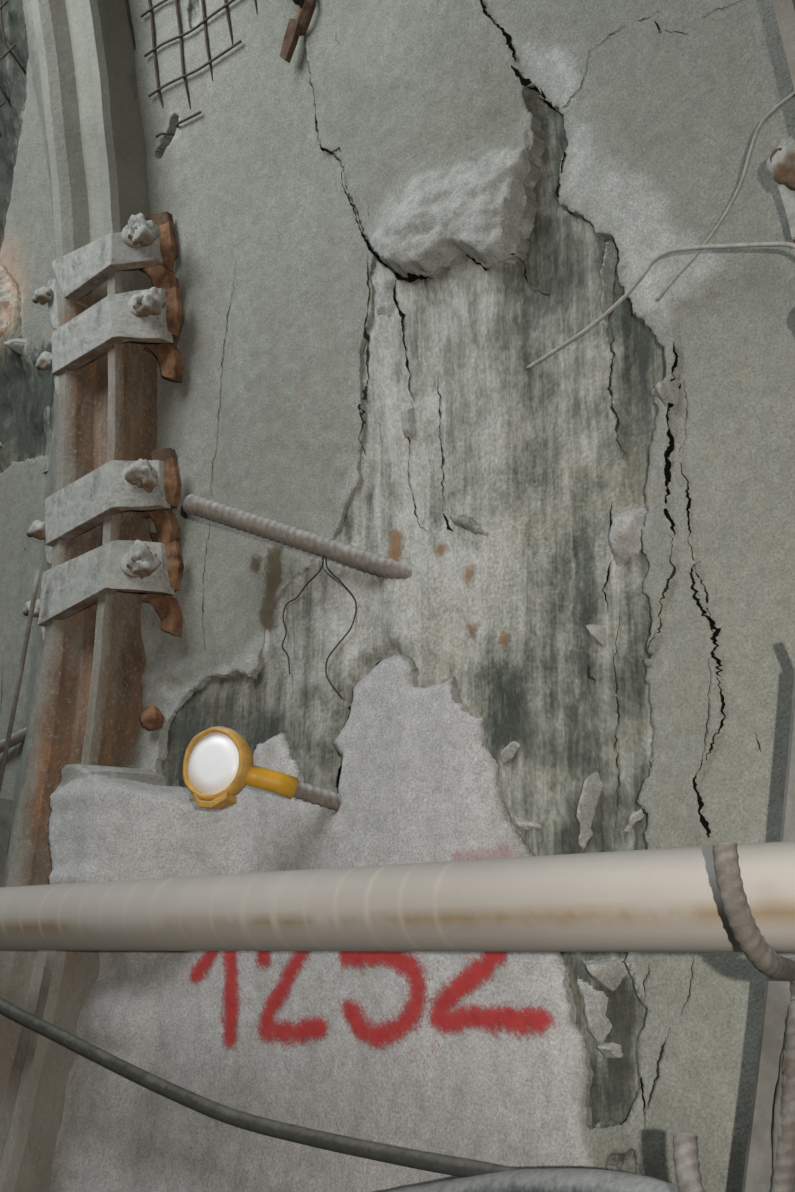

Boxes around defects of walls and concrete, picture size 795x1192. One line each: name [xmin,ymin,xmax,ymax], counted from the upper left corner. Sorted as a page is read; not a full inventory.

spalling [0,0,29,249]
crack [556,152,566,208]
crack [480,0,742,117]
crack [466,254,554,295]
spalling [0,264,53,473]
spalling [161,91,679,856]
crack [607,321,625,460]
crack [647,342,726,838]
crack [587,558,620,827]
spalling [562,952,648,1128]
crack [640,957,694,1124]
spalling [607,1150,642,1175]